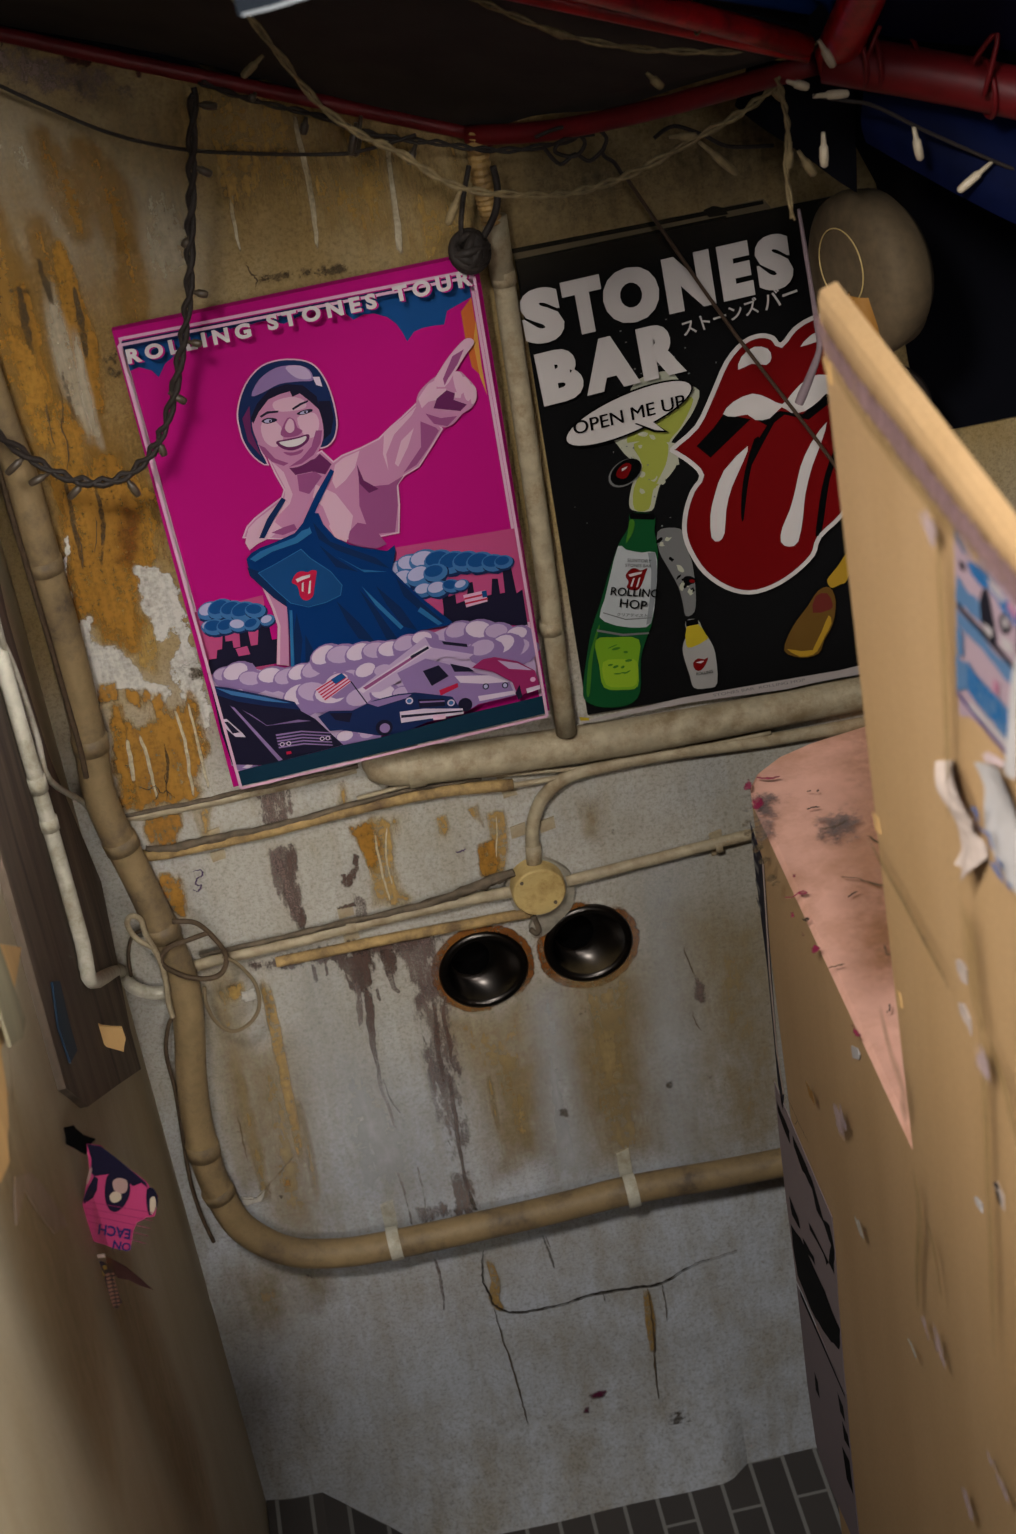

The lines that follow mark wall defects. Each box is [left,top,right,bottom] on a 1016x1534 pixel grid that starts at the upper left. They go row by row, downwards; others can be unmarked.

peeling [63,536,73,598]
peeling [79,565,213,730]
corrosion [349,818,409,906]
corrosion [437,816,448,835]
corrosion [468,807,507,877]
crack [481,1250,737,1423]